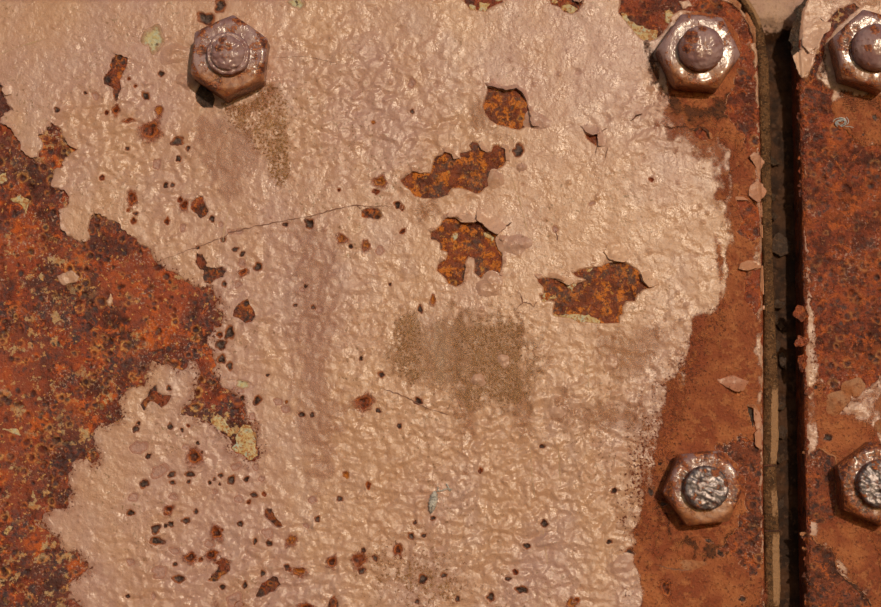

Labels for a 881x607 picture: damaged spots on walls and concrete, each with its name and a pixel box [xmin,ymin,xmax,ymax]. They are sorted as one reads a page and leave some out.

peeling [104,51,190,162]
peeling [0,84,315,607]
crack [163,205,393,260]
peeling [398,140,525,198]
peeling [428,205,507,286]
peeling [534,242,660,324]
rust [617,11,768,607]
peeling [789,0,881,395]
rust [804,237,881,467]
rust [831,90,881,147]
rust [146,359,266,467]
rust [812,483,881,607]